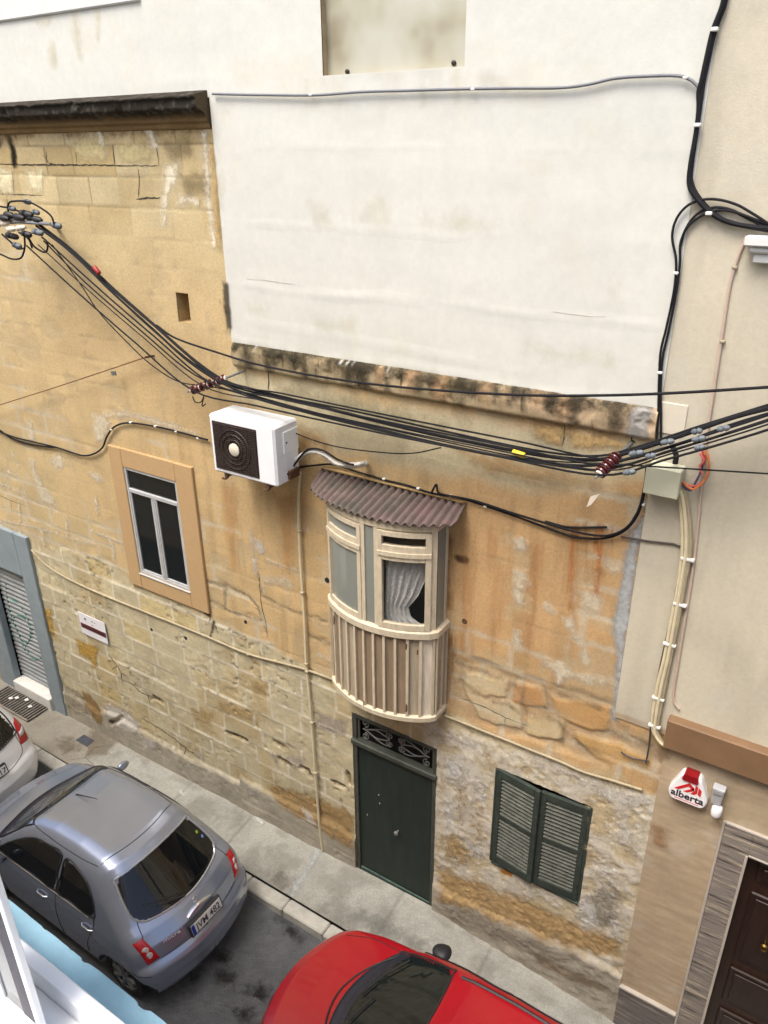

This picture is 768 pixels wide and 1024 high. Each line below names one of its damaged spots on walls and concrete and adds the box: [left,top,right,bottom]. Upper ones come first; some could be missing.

leakage [231,342,652,428]